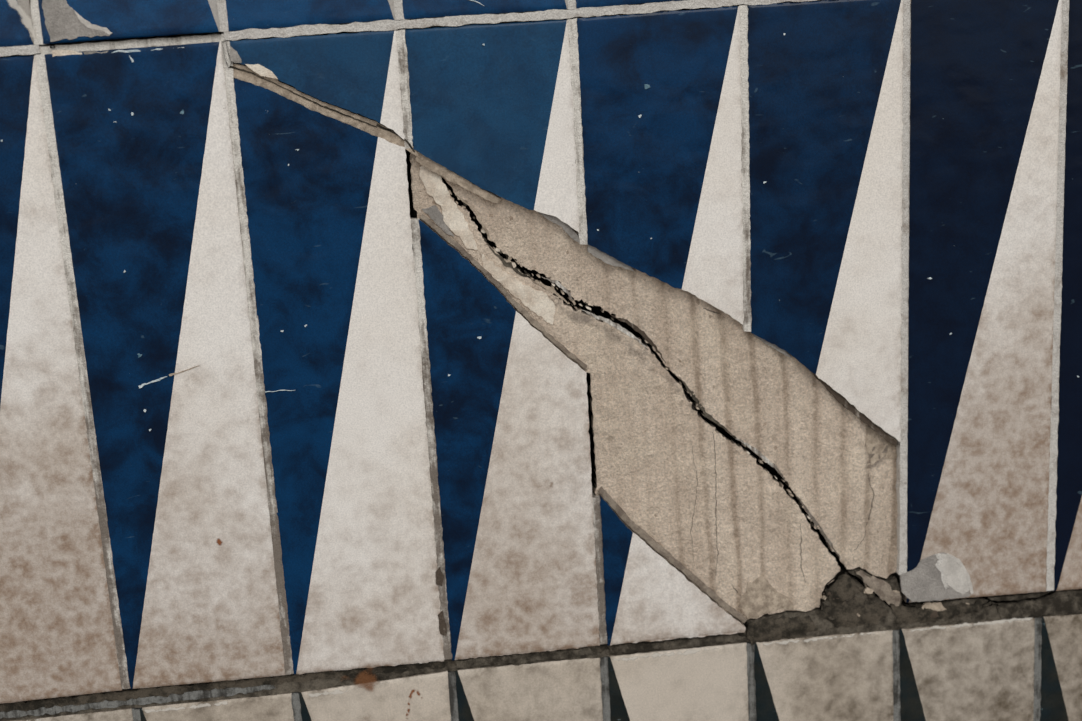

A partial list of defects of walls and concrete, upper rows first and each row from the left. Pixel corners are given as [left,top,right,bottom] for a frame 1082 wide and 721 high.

crack [222,42,422,160]
spalling [410,146,1031,646]
crack [441,177,1082,611]